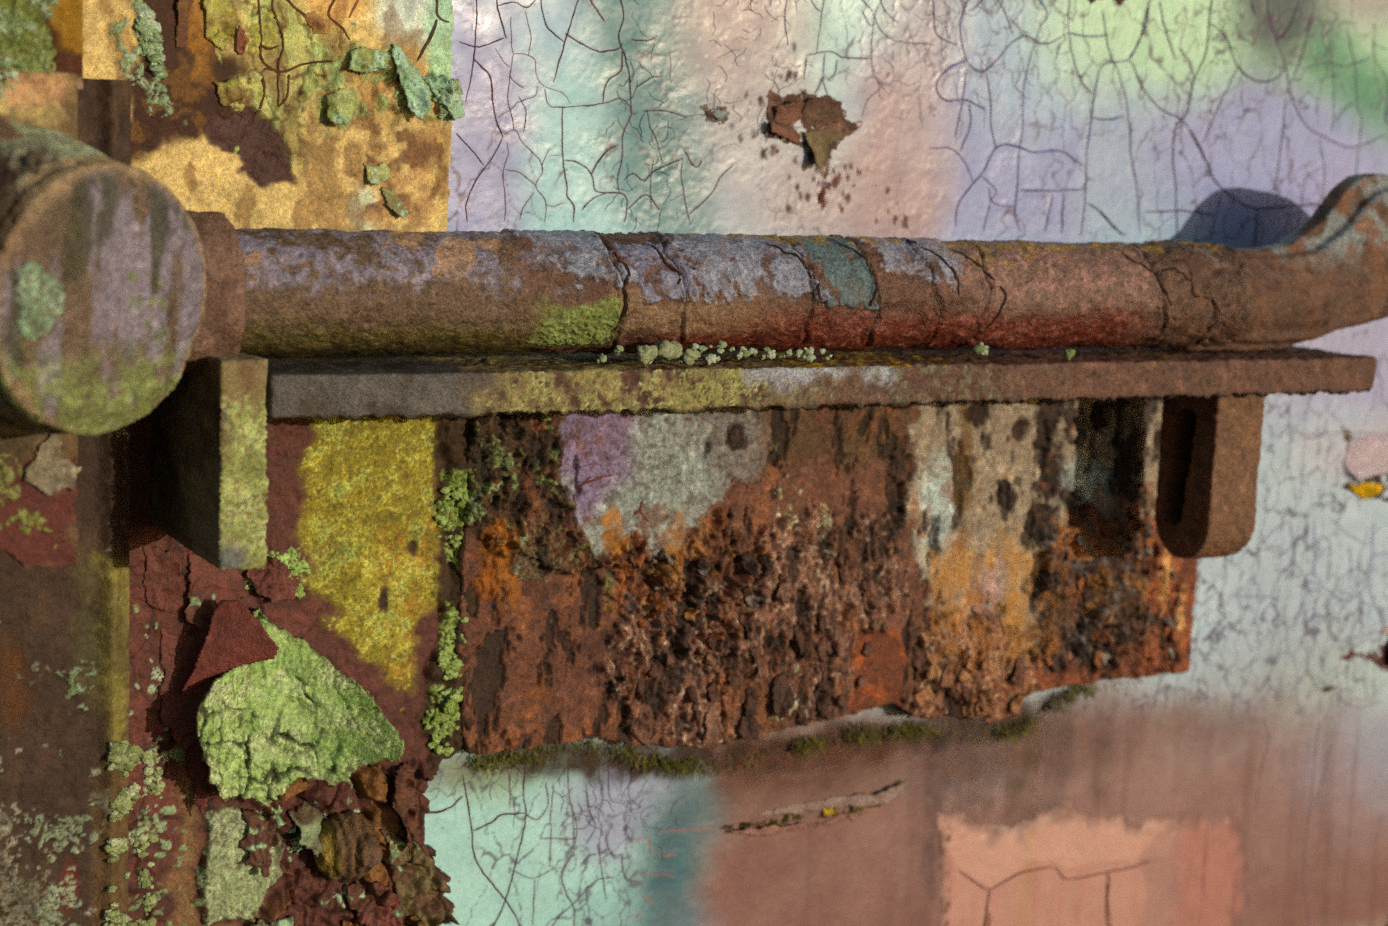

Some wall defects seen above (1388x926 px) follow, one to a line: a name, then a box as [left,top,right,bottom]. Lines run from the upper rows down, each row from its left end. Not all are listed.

crack [254,0,359,121]
peeling [348,44,465,120]
peeling [763,90,863,169]
corrosion [787,157,861,212]
crack [418,0,1388,333]
peeling [23,434,82,496]
corrosion [476,520,517,599]
crack [558,474,613,533]
corrosion [523,508,1027,779]
corrosion [1039,531,1112,673]
peeling [142,543,460,926]
crack [428,747,713,926]